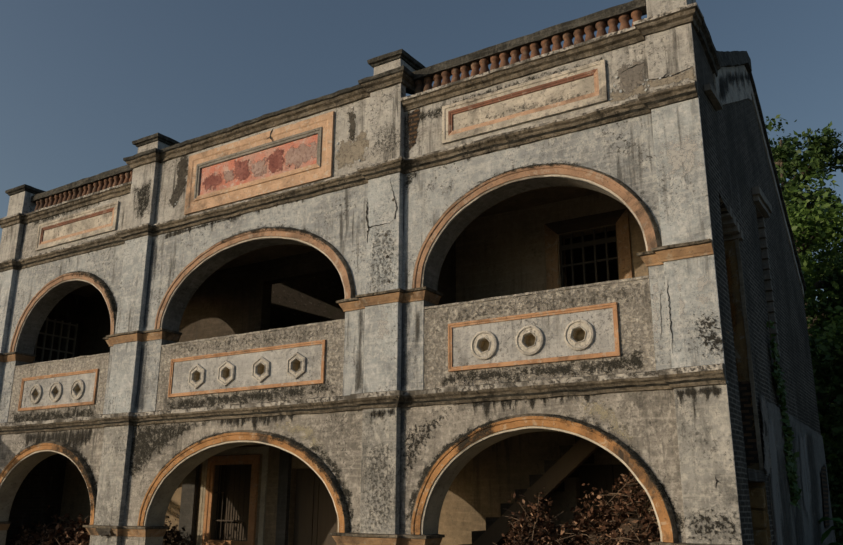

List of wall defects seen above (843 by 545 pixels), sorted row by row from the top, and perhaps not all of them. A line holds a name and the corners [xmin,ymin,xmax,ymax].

peeling [609,61,647,102]
damp [719,72,750,100]
flaking render [407,109,420,151]
damp [20,202,99,250]
damp [133,180,157,218]
crack [366,182,397,258]
crack [660,282,673,353]
damp [440,346,643,386]
mould [167,381,333,410]
damp [675,385,721,414]
damp [126,415,354,530]
damp [370,395,683,539]